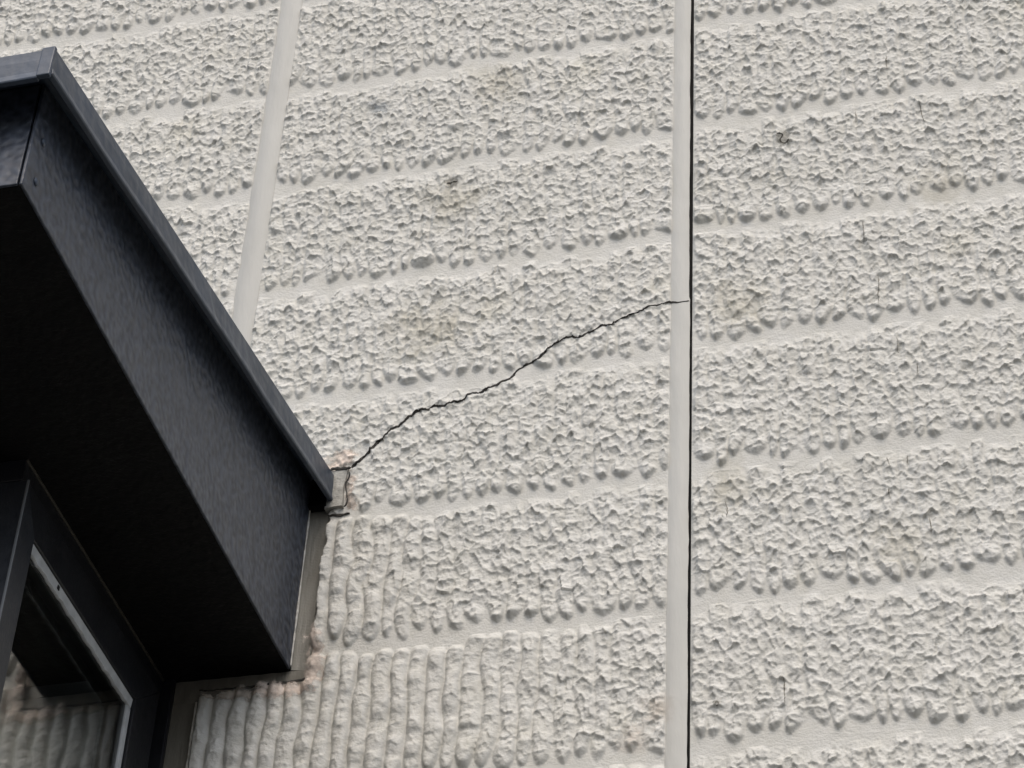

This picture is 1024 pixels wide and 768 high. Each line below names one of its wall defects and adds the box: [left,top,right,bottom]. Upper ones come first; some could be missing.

crack [328,300,689,517]